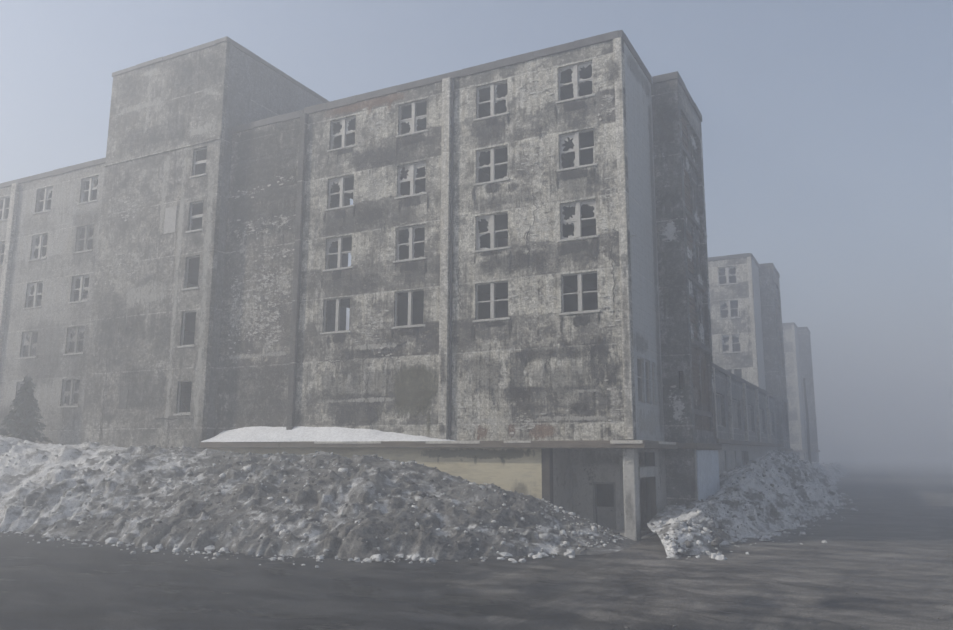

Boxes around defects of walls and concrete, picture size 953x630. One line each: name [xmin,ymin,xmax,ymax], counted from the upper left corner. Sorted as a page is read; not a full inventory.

water stain [472,182,517,202]
water stain [556,168,598,187]
water stain [560,239,599,258]
crack [610,224,634,302]
water stain [193,163,215,430]
peeling [225,215,295,353]
water stain [560,313,600,328]
water stain [320,328,419,359]
water stain [510,337,617,422]